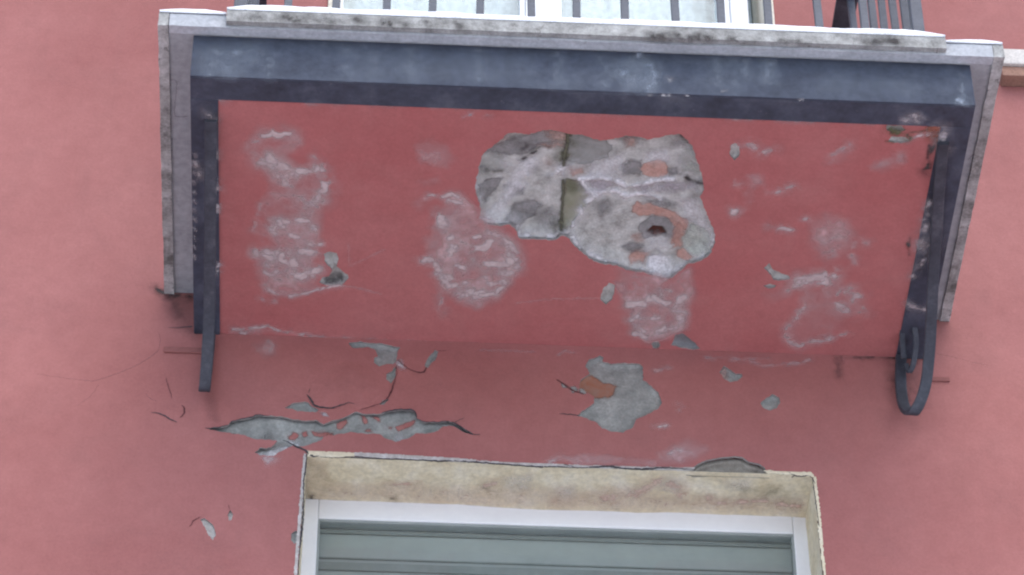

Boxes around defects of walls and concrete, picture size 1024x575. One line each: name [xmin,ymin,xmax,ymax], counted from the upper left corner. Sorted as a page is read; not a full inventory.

water stain [256,130,299,142]
water stain [253,152,342,298]
spalling [320,252,348,284]
water stain [421,192,521,308]
spalling [475,130,715,279]
water stain [617,270,693,340]
peeling [349,343,404,383]
crack [307,350,480,435]
peeling [561,357,662,433]
peeling [201,520,216,540]
crack [207,414,695,557]
peeling [210,401,826,575]